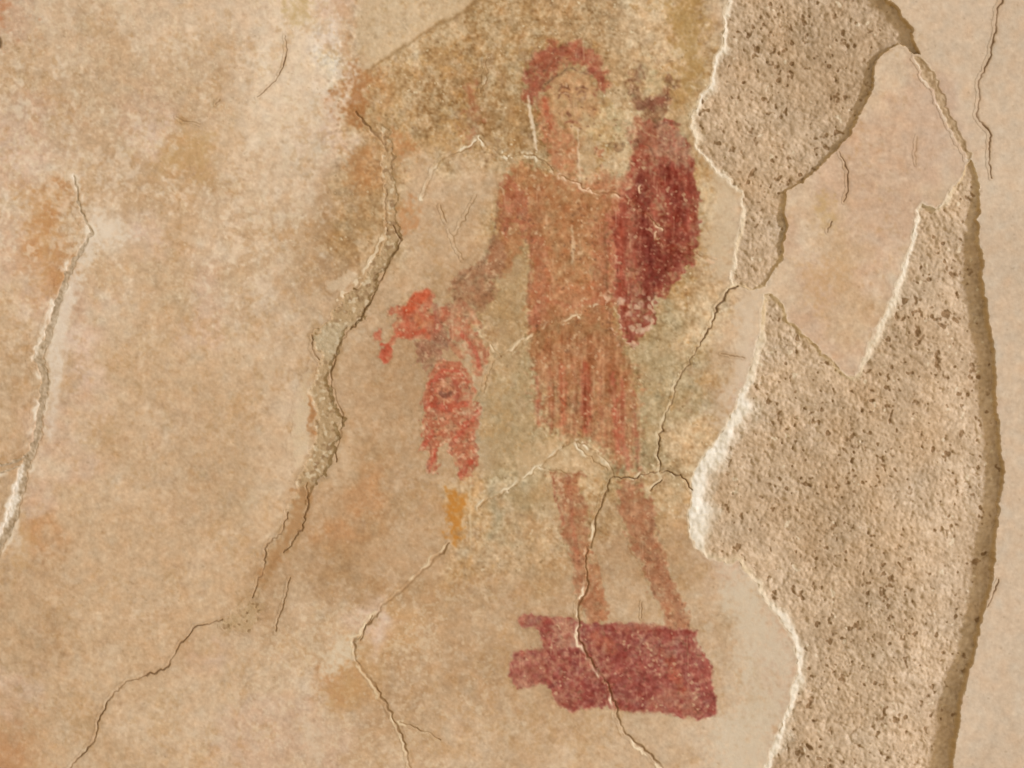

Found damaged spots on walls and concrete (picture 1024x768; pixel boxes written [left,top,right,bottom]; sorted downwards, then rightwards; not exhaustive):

crack [0,168,100,572]
crack [66,108,747,768]
spalling [686,0,1007,768]
crack [910,0,1006,181]